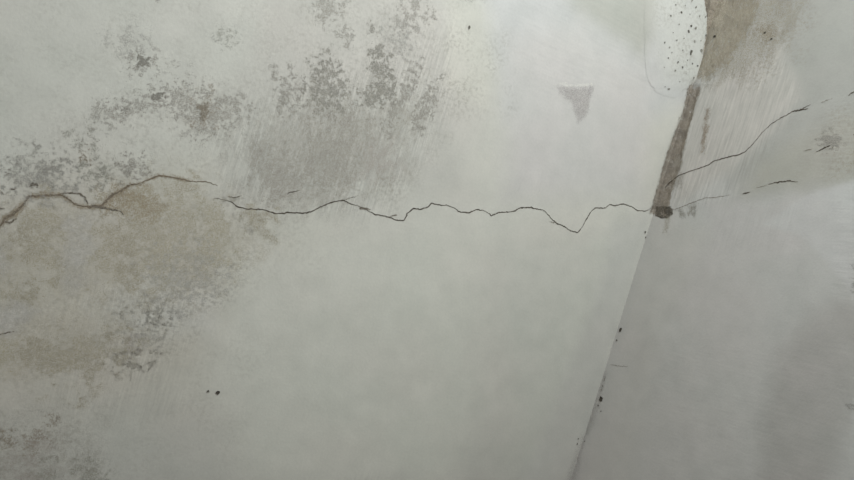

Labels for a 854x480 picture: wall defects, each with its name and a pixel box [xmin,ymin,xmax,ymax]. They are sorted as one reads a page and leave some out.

crack [665,100,826,187]
water stain [0,0,448,480]
crack [0,173,795,233]